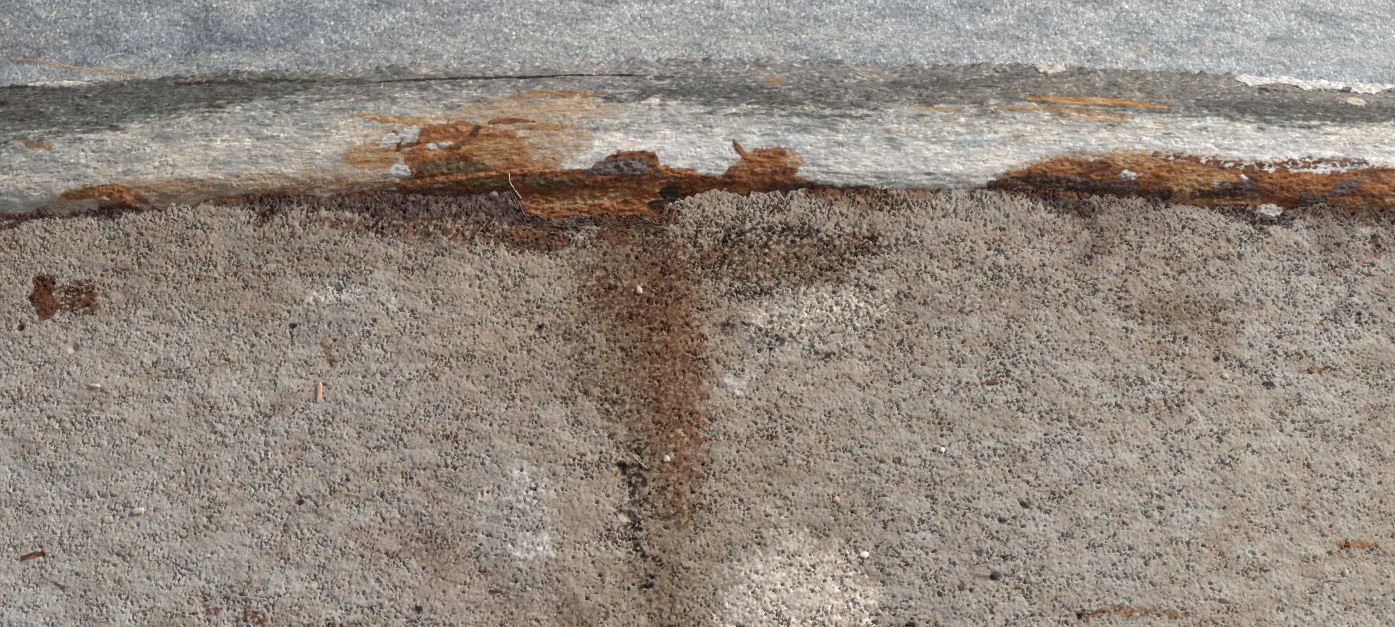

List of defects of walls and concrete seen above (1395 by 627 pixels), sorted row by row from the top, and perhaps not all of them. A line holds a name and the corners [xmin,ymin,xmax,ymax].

rust [994,96,1169,130]
rust [1151,152,1369,173]
rust [969,187,1104,228]
rust [1218,204,1395,276]
rust [0,90,950,625]
efflorescence [709,496,887,627]